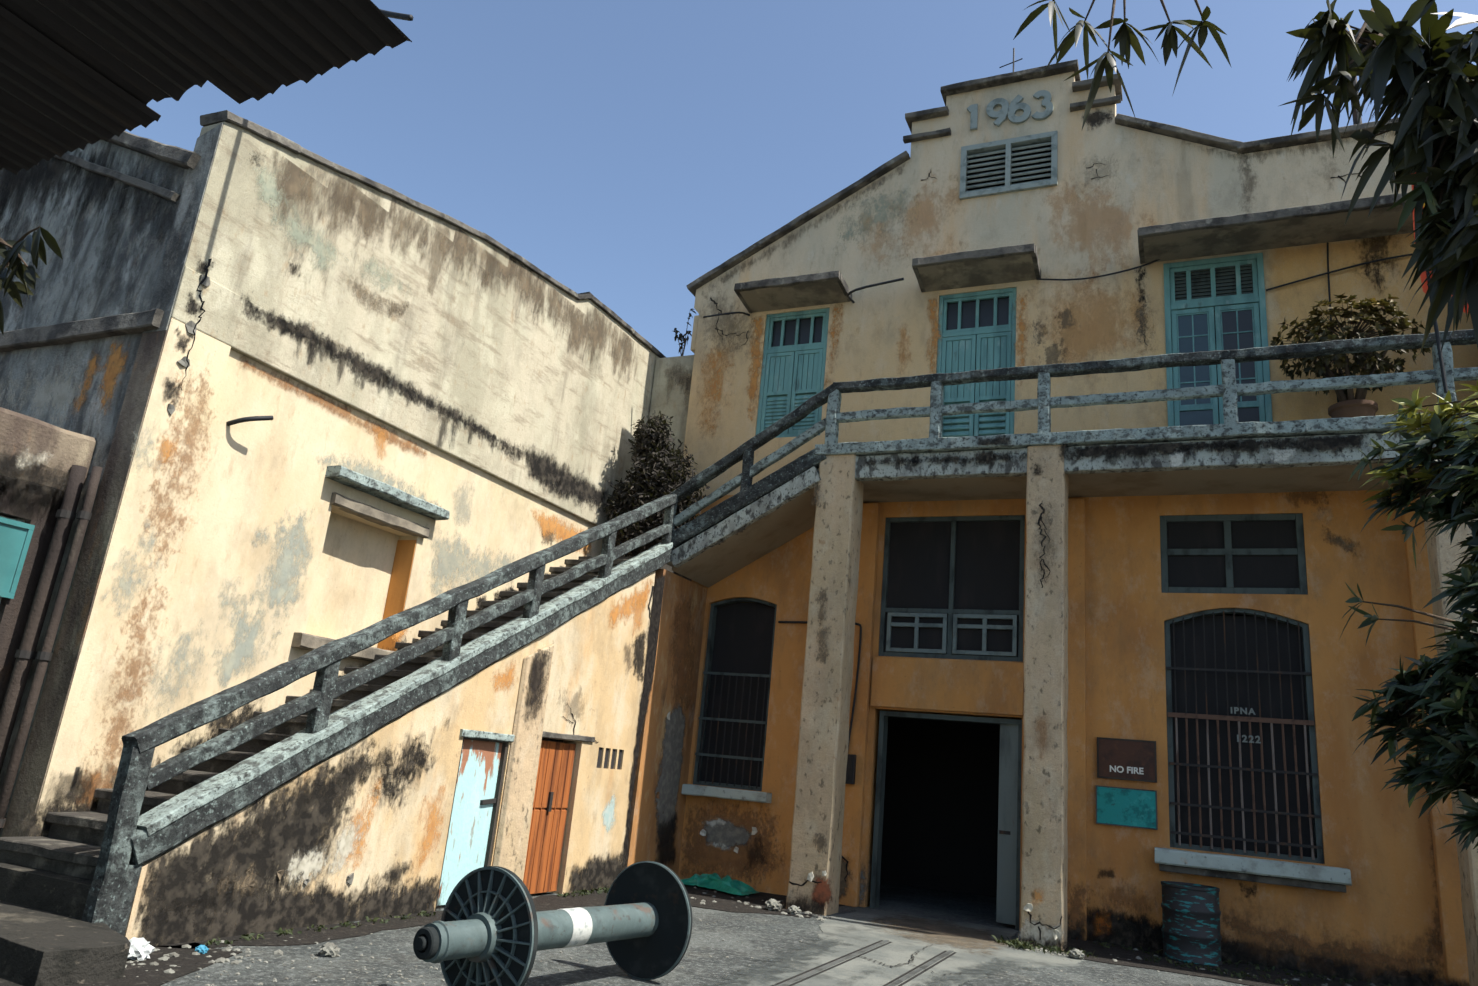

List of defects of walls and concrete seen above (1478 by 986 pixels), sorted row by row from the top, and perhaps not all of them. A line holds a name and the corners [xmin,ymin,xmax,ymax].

water stain [0,152,164,238]
water stain [253,155,633,374]
rust [76,343,127,410]
mould [242,297,608,511]
crack [1038,503,1050,588]
mould [178,703,262,753]
flaking render [655,703,685,865]
mould [136,737,441,946]
mould [569,852,627,894]
flaking render [700,818,758,853]
water stain [1067,889,1163,951]
water stain [1221,917,1470,986]